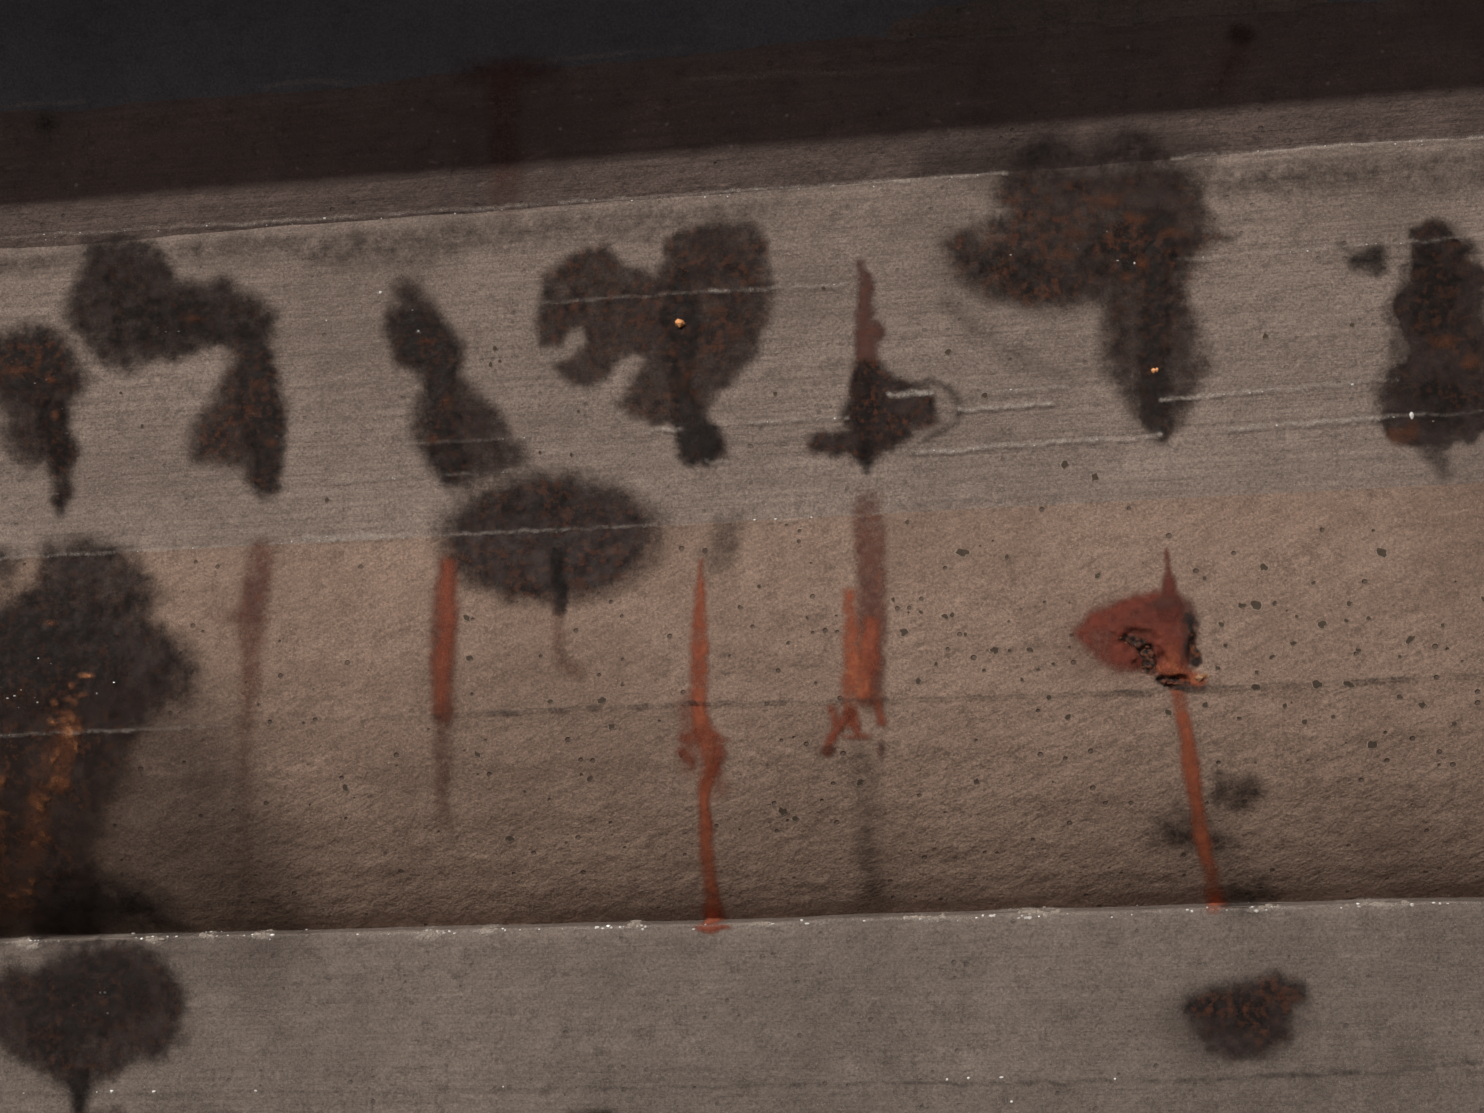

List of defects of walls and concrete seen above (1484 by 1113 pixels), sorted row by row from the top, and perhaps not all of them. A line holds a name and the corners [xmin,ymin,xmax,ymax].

water stain [0,236,285,513]
water stain [379,281,659,614]
water stain [538,224,771,464]
water stain [945,135,1227,441]
water stain [1313,221,1484,458]
water stain [0,539,197,1113]
rust [430,559,456,732]
rust [678,563,730,931]
rust [822,497,886,755]
water stain [903,906,1068,922]
rust [1077,550,1226,911]
water stain [1184,973,1305,1058]